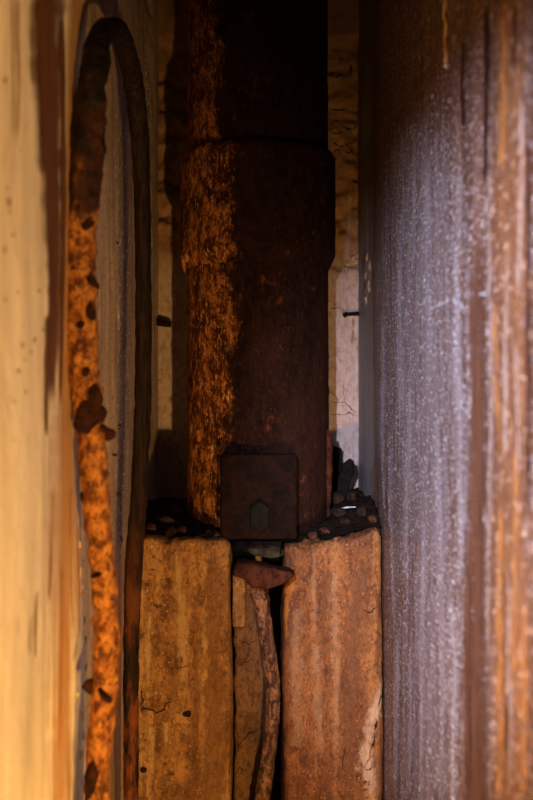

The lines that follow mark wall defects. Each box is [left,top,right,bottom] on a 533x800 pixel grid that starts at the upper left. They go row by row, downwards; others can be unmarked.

damp [377,114,487,800]